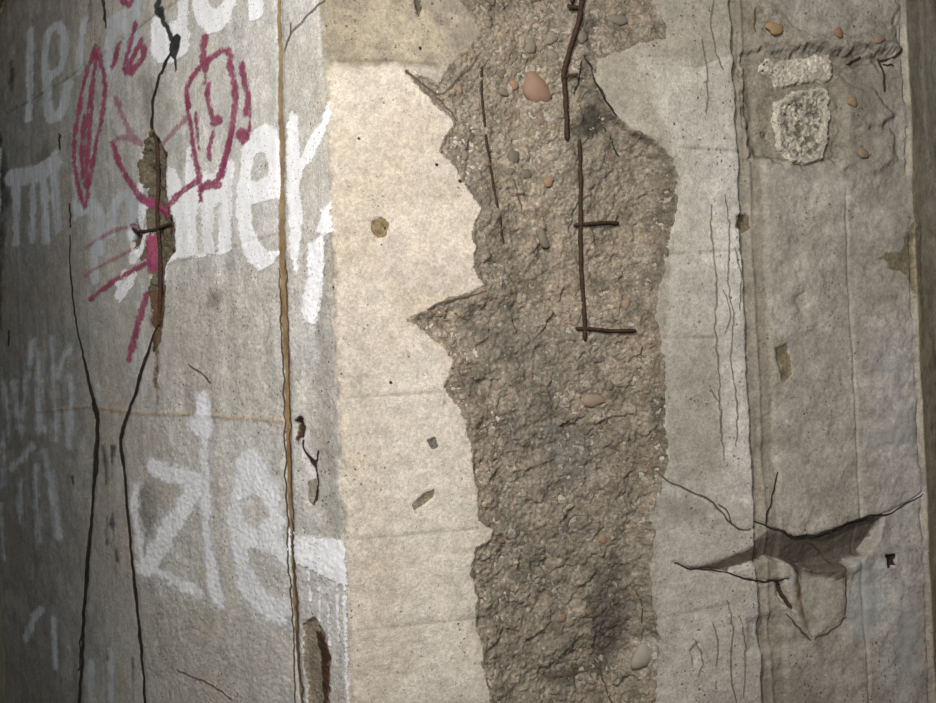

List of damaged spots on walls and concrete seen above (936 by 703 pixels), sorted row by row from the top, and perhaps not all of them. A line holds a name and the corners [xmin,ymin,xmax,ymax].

crack [99,0,107,28]
crack [150,0,181,136]
spalling [742,0,897,163]
spalling [130,129,176,352]
spalling [736,214,750,235]
rust [277,0,306,703]
spalling [405,0,679,703]
spalling [775,343,792,383]
crack [69,203,158,703]
spalling [686,517,880,636]
crack [176,669,232,699]
spalling [302,617,331,703]